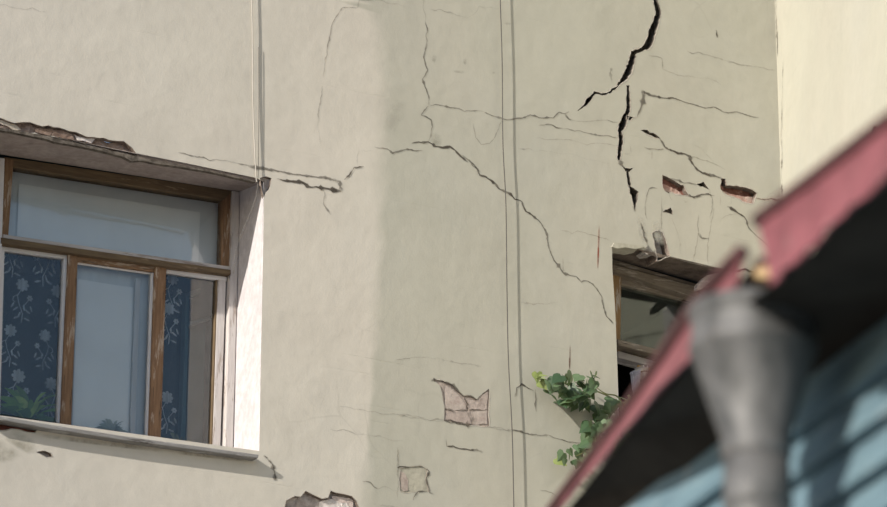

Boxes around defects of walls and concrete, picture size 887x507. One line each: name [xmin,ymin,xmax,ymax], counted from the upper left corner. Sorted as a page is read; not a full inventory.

crack [423,25,453,120]
spalling [0,118,138,156]
crack [487,0,752,241]
crack [254,166,361,192]
spalling [662,175,689,196]
spalling [720,178,758,204]
crack [391,141,612,322]
crack [729,207,762,240]
peeling [433,378,490,427]
peeling [398,466,430,497]
spalling [284,490,359,507]